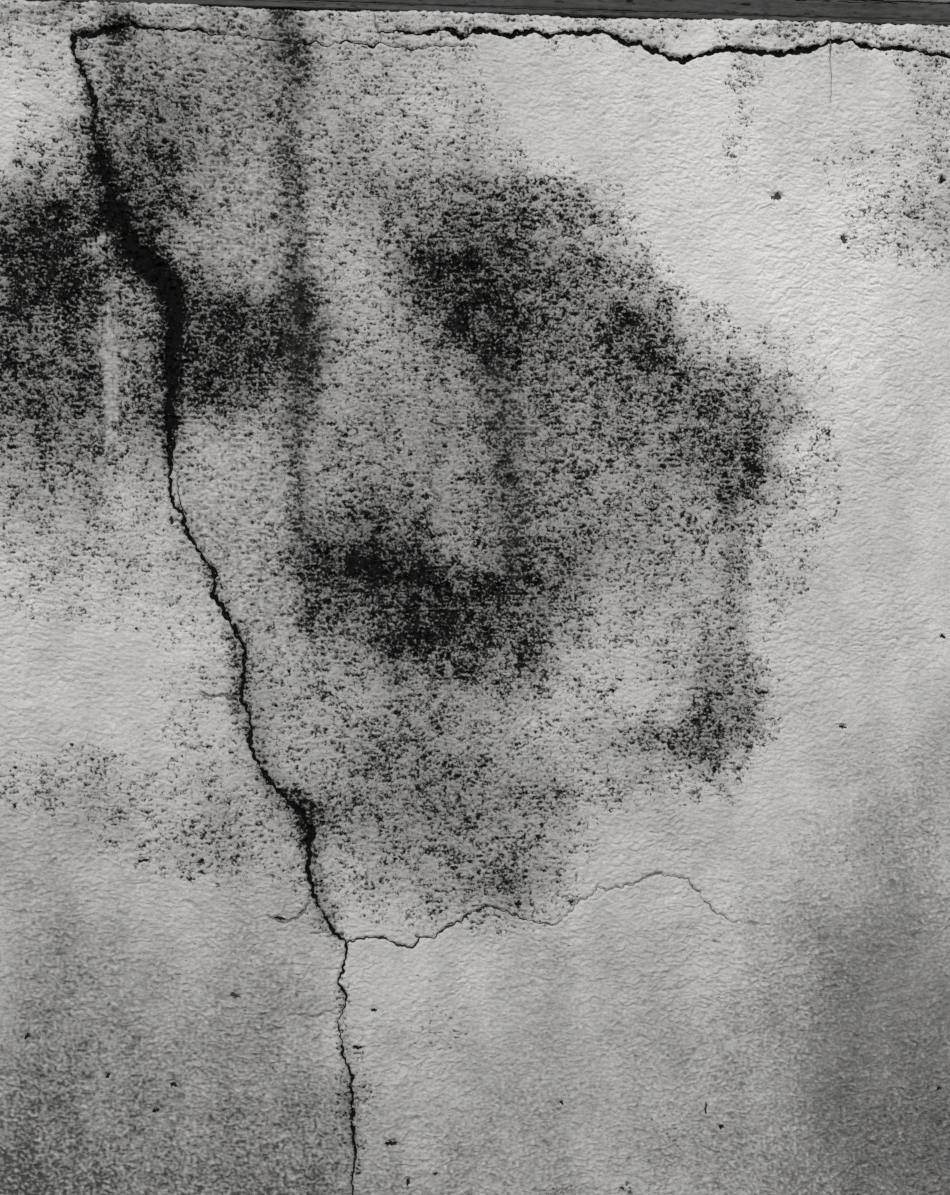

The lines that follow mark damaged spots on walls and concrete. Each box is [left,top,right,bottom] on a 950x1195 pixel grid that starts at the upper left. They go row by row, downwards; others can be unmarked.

crack [231,13,950,65]
water stain [813,51,950,267]
water stain [0,0,841,947]
crack [70,22,701,1195]
crack [702,899,770,925]